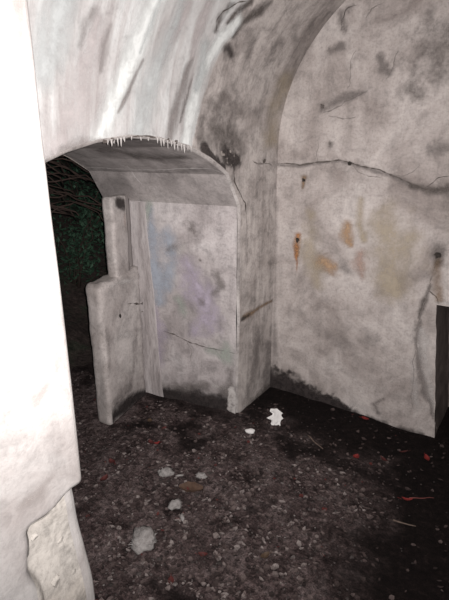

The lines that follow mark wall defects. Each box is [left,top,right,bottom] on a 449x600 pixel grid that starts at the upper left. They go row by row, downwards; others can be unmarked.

damp [60,0,165,152]
crack [233,167,247,223]
crack [253,144,449,193]
crack [164,331,234,361]
damp [247,343,357,413]
spalling [26,496,87,600]